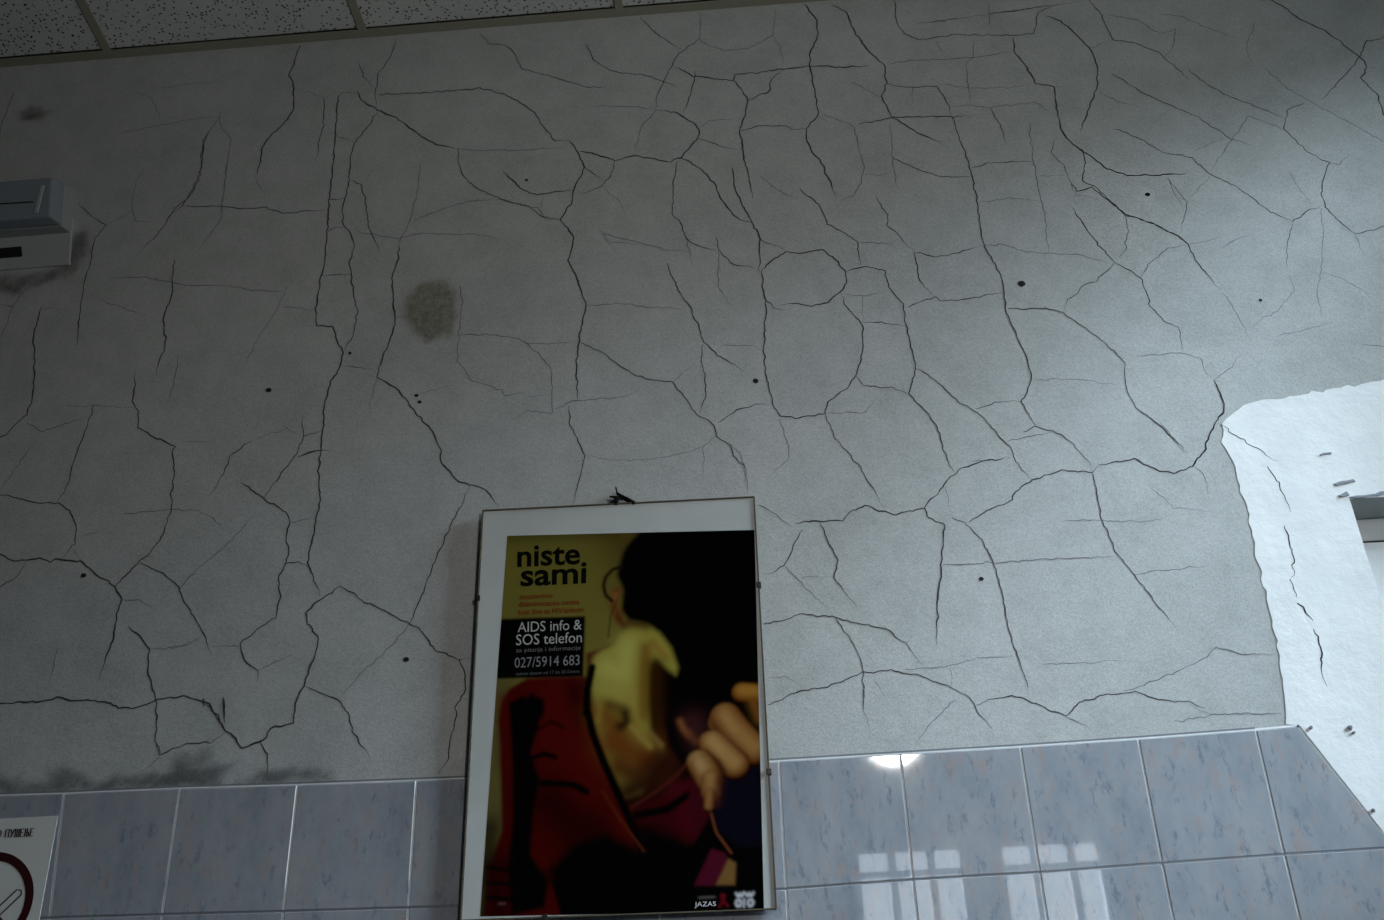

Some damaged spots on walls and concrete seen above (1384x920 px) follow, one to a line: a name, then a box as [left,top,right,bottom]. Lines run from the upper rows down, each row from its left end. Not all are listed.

crack [894,0,1384,305]
crack [0,4,1277,780]
crack [1223,277,1294,342]
crack [1284,526,1327,686]